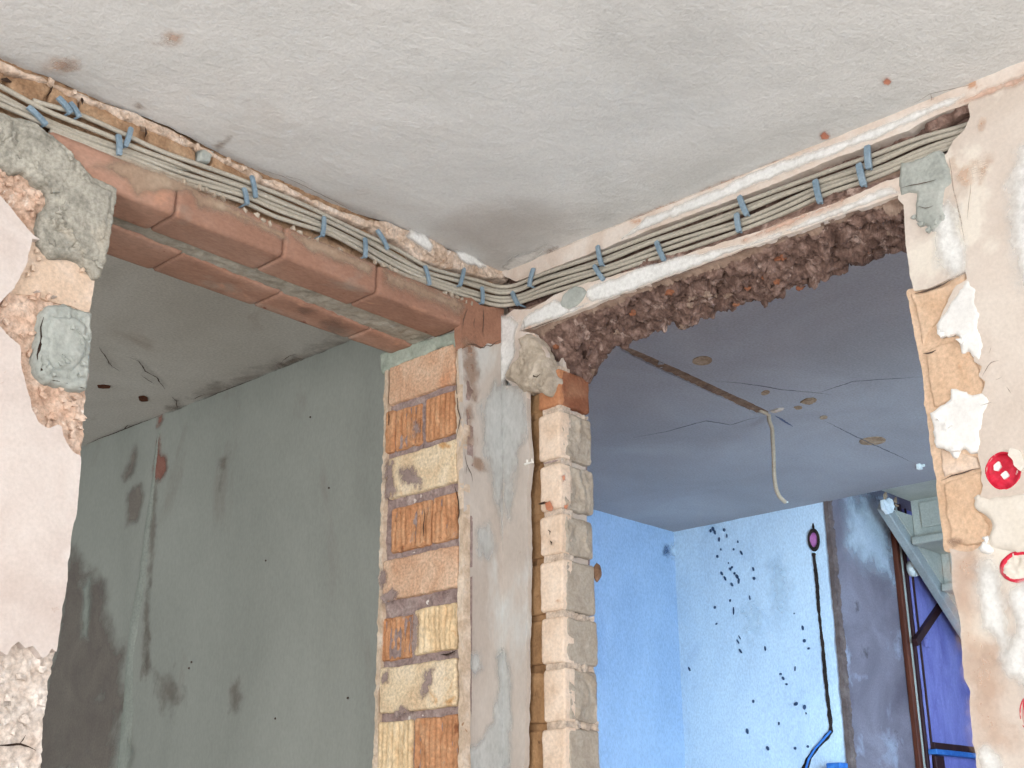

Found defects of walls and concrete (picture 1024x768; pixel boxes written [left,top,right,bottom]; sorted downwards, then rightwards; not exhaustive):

flaking render [0,169,95,456]
crack [99,347,325,408]
flaking render [0,59,970,313]
crack [825,421,911,462]
flaking render [906,273,992,553]
peeling [0,557,131,768]